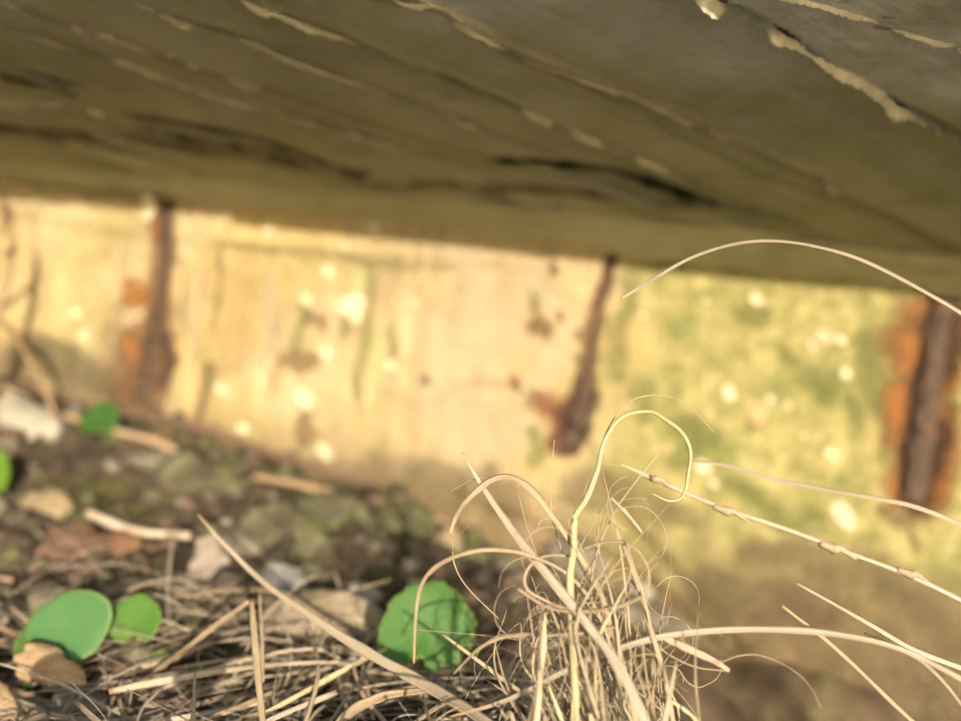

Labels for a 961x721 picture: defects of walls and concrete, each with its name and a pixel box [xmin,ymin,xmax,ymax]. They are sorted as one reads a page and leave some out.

peeling [779,0,961,54]
crack [122,114,371,177]
crack [491,156,756,212]
corrosion [110,194,180,412]
corrosion [527,254,619,457]
corrosion [879,295,961,550]